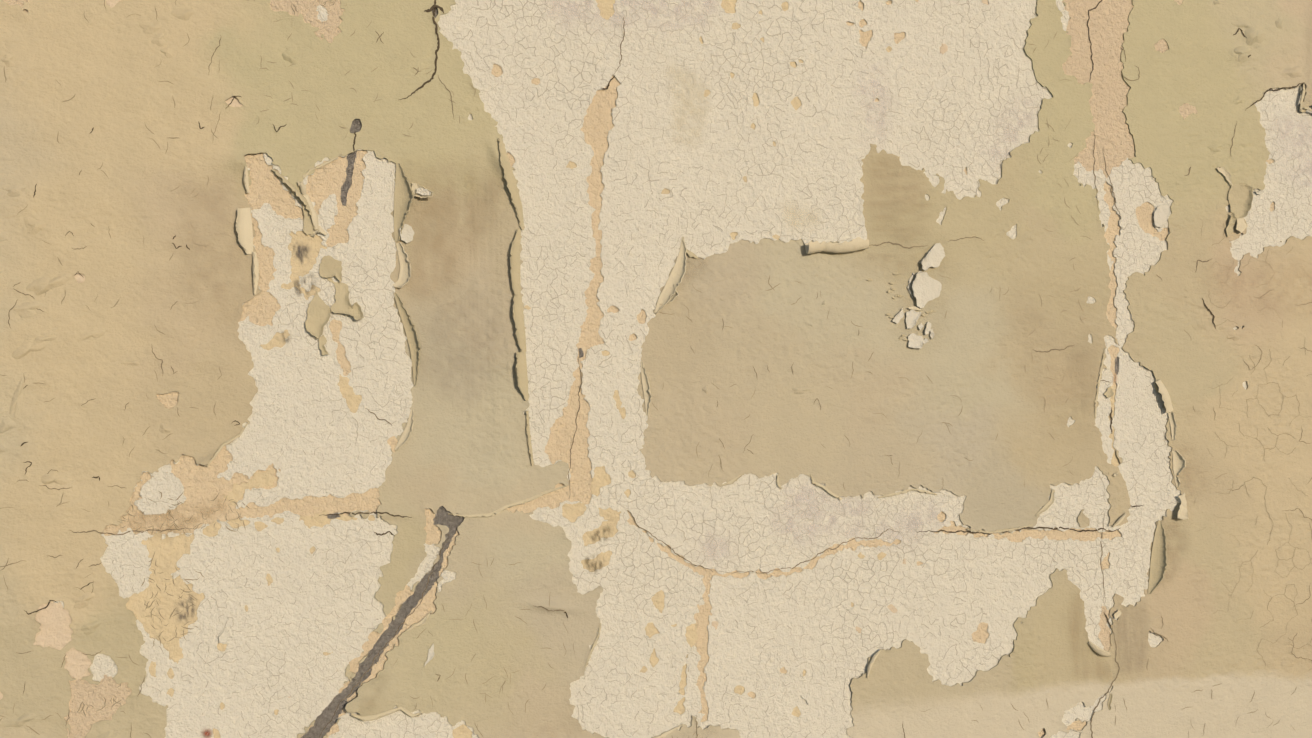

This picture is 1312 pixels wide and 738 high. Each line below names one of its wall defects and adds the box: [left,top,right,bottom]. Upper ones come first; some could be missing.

spalling [350,119,362,133]
crack [248,0,476,153]
peeling [1217,84,1312,276]
peeling [100,149,479,738]
crack [696,362,794,477]
peeling [432,0,1189,738]
crack [766,276,972,474]
crack [990,119,1122,476]
crack [1184,223,1312,738]
peeling [33,601,118,682]
crack [319,536,575,738]
crack [627,505,1168,738]